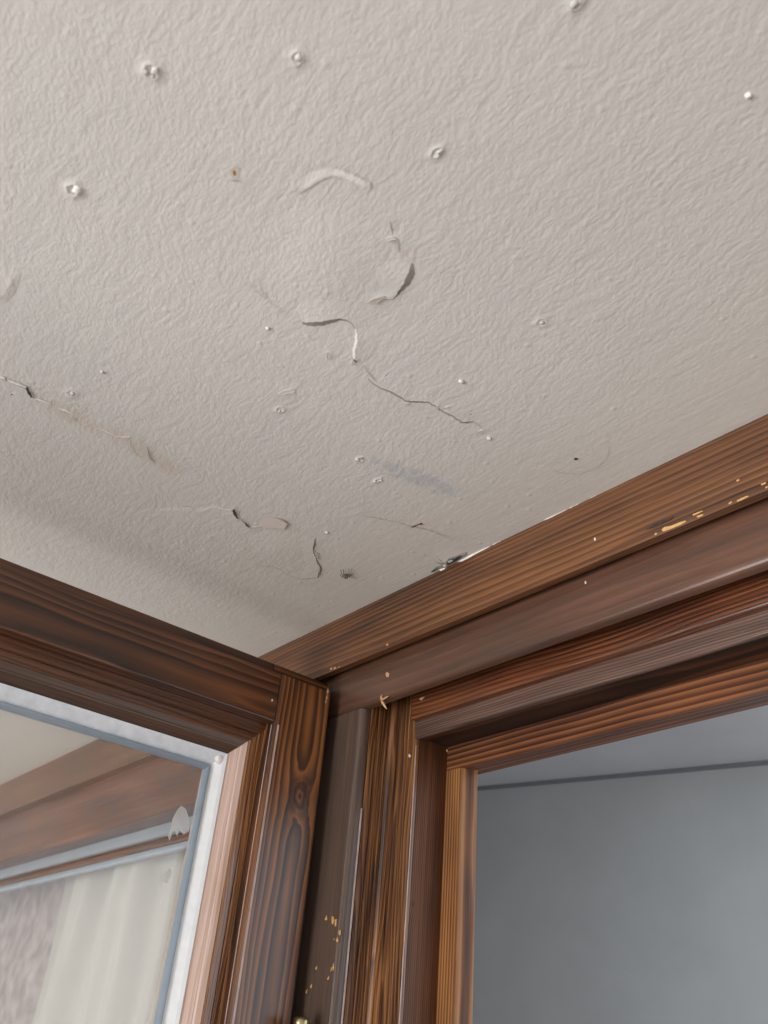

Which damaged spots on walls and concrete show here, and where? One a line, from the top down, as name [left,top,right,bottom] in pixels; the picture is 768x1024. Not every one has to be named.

peeling [298,260,415,366]
crack [0,376,262,536]